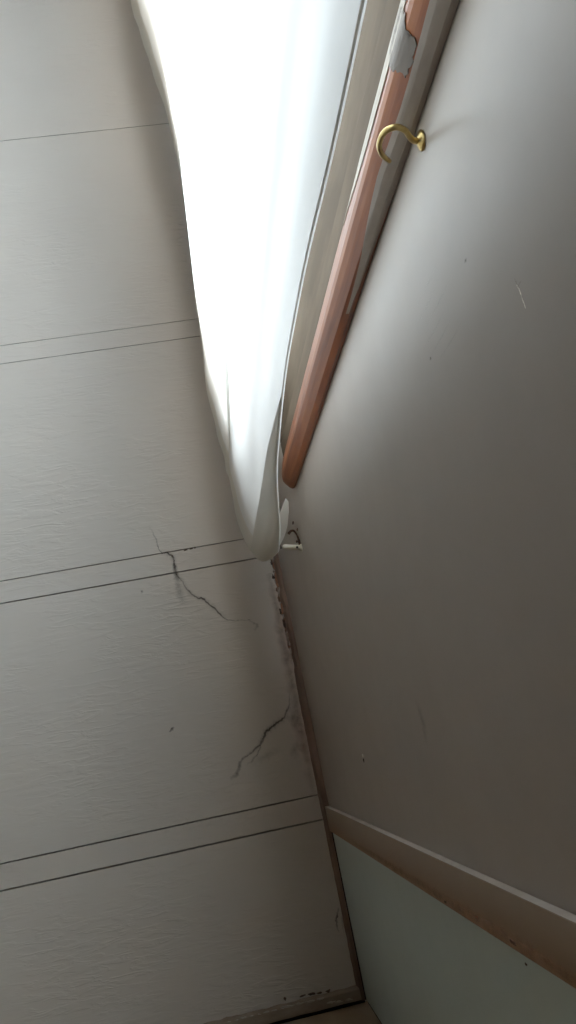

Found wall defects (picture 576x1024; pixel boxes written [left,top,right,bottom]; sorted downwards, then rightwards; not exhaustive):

peeling [343,0,460,314]